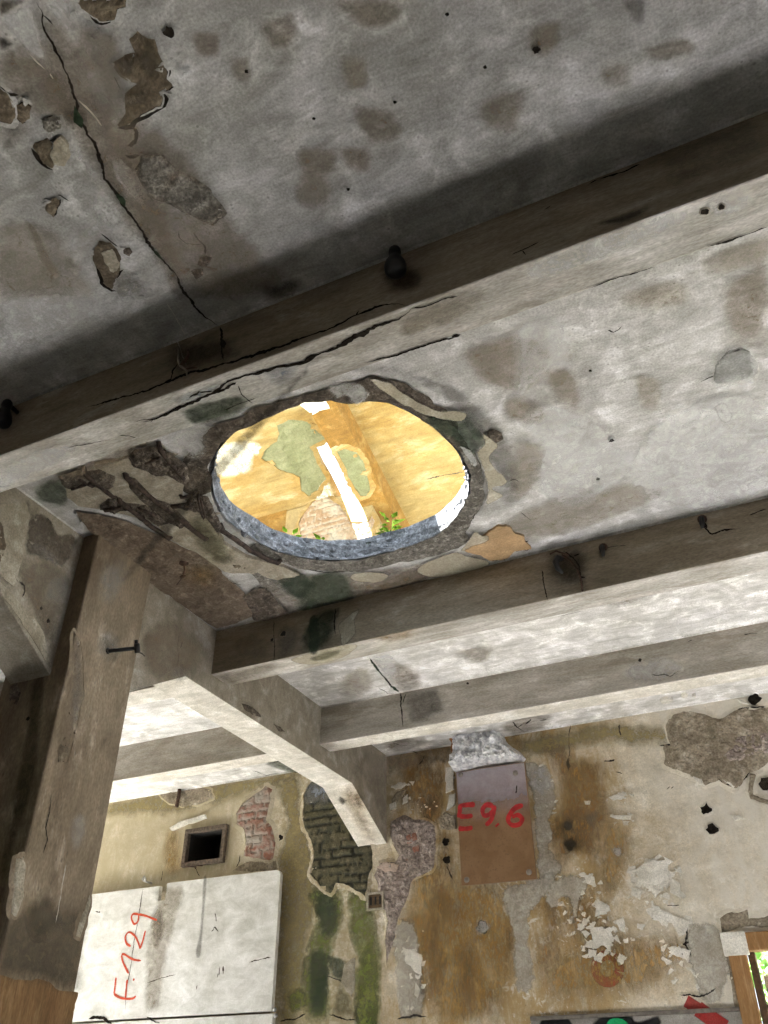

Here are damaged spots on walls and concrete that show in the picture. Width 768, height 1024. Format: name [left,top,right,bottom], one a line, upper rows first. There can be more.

spalling [71,0,232,228]
crack [37,4,460,448]
damp [127,370,306,575]
spalling [0,376,531,662]
damp [467,327,652,536]
damp [632,397,768,509]
flaking render [231,782,284,874]
flaking render [299,767,459,1011]
crack [370,659,424,764]
rust [551,745,627,891]
peeling [556,854,708,993]
spalling [659,692,768,836]